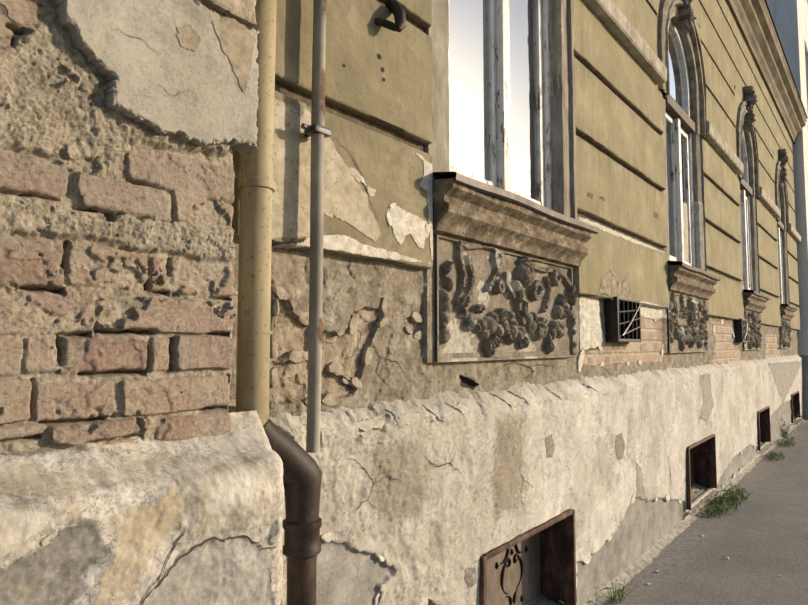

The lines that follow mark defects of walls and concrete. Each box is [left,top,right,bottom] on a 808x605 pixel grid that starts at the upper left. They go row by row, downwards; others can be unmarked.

flaking render [0,0,45,49]
flaking render [54,0,259,154]
flaking render [549,0,563,105]
peeling [272,98,311,249]
peeling [323,137,434,264]
flaking render [269,286,309,406]
flaking render [321,297,389,406]
flaking render [404,312,423,340]
crack [351,458,402,510]
crack [142,529,276,605]
flaking render [316,532,397,605]
flaking render [576,493,686,605]